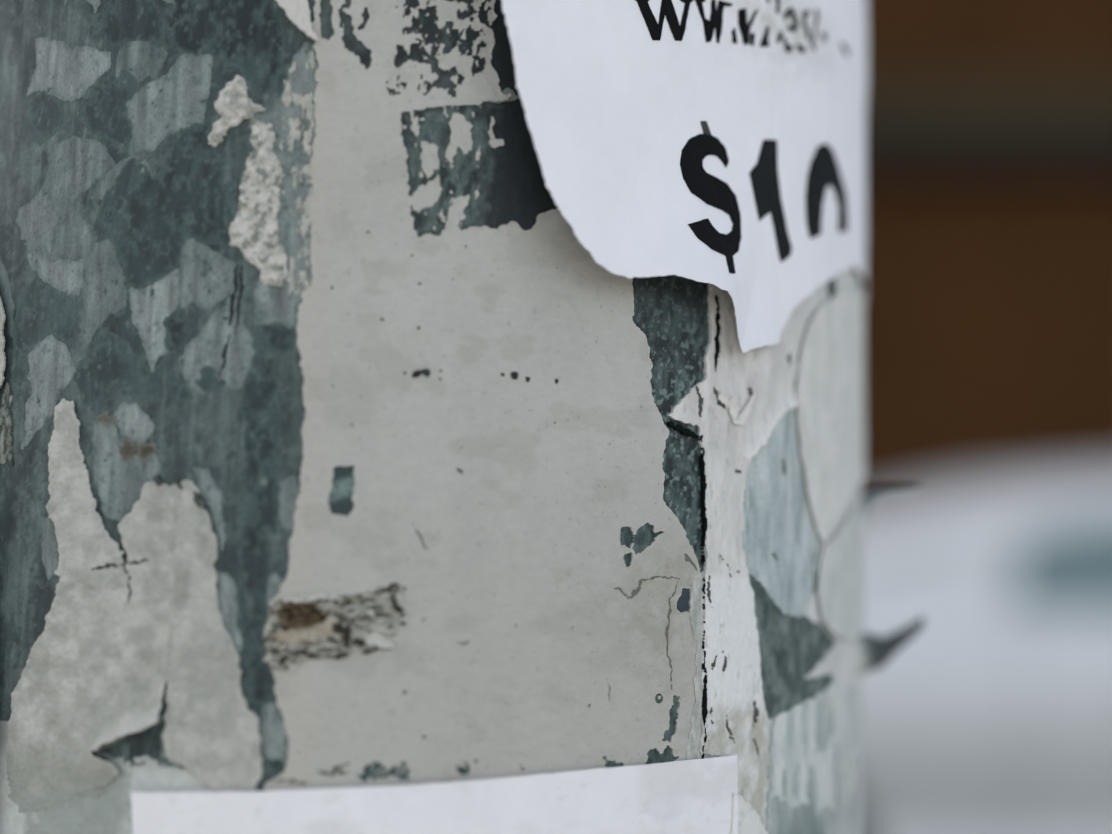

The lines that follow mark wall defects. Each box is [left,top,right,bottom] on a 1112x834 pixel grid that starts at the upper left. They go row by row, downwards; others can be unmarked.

peeling [279,51,316,297]
peeling [307,0,372,69]
peeling [386,0,558,237]
peeling [632,275,708,569]
crack [713,295,721,372]
peeling [6,398,263,813]
spalling [620,523,663,567]
crack [614,422,708,759]
spalling [677,588,690,612]
peeling [741,409,835,719]
spalling [603,756,623,768]
spalling [645,694,678,765]